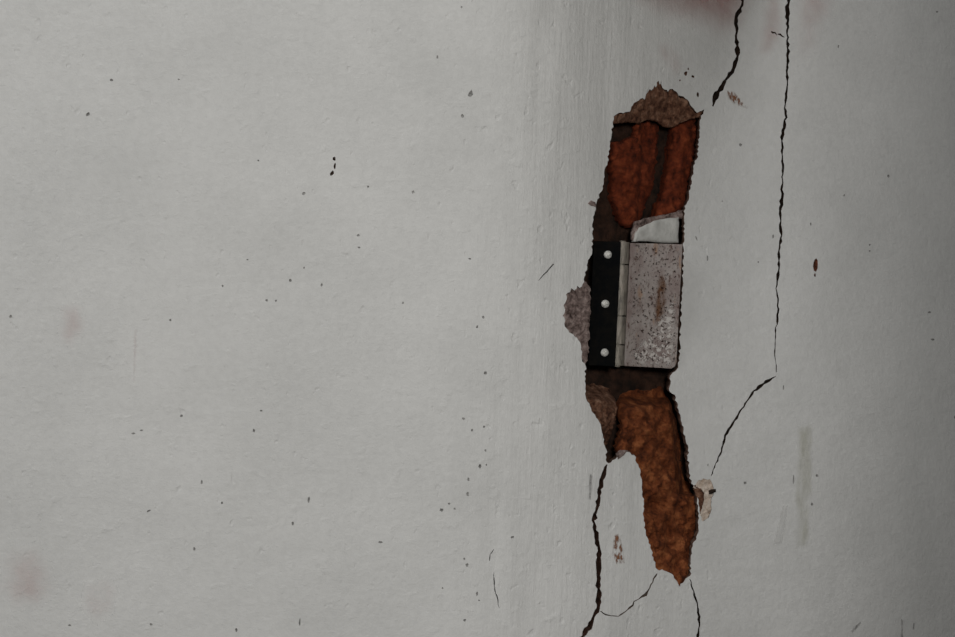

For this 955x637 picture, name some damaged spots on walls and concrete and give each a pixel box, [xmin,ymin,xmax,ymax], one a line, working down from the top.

spalling [563,68,716,586]
rust [632,245,678,367]
crack [711,0,790,476]
crack [581,464,657,637]
crack [690,580,701,637]